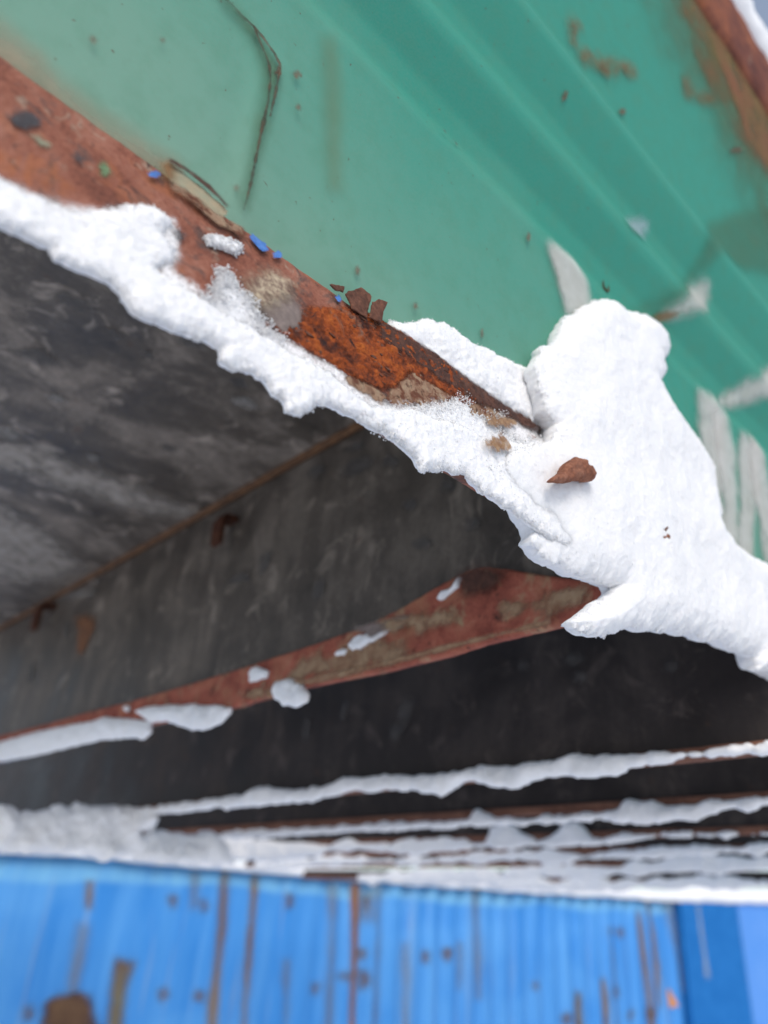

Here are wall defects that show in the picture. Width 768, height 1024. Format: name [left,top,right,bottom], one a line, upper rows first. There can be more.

corrosion [0,38,163,170]
corrosion [683,0,768,169]
corrosion [265,284,542,430]
corrosion [458,567,501,595]
corrosion [27,993,96,1024]
corrosion [109,960,133,1024]
corrosion [197,873,228,1024]
corrosion [245,877,257,993]
corrosion [345,884,368,1024]
corrosion [563,993,582,1024]
corrosion [601,980,617,1024]
corrosion [637,902,659,1024]